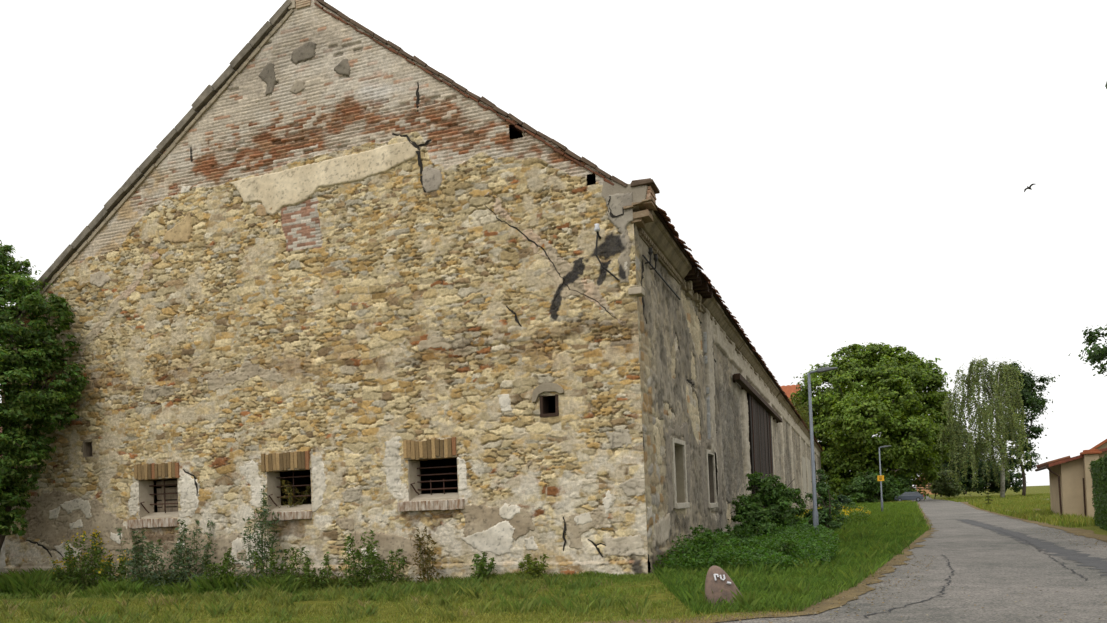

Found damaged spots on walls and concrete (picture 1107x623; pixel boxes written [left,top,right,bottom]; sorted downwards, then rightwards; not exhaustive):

flaking render [670,278,712,445]
flaking render [653,403,675,466]
flaking render [457,457,468,490]
flaking render [461,502,539,556]
flaking render [562,477,687,557]